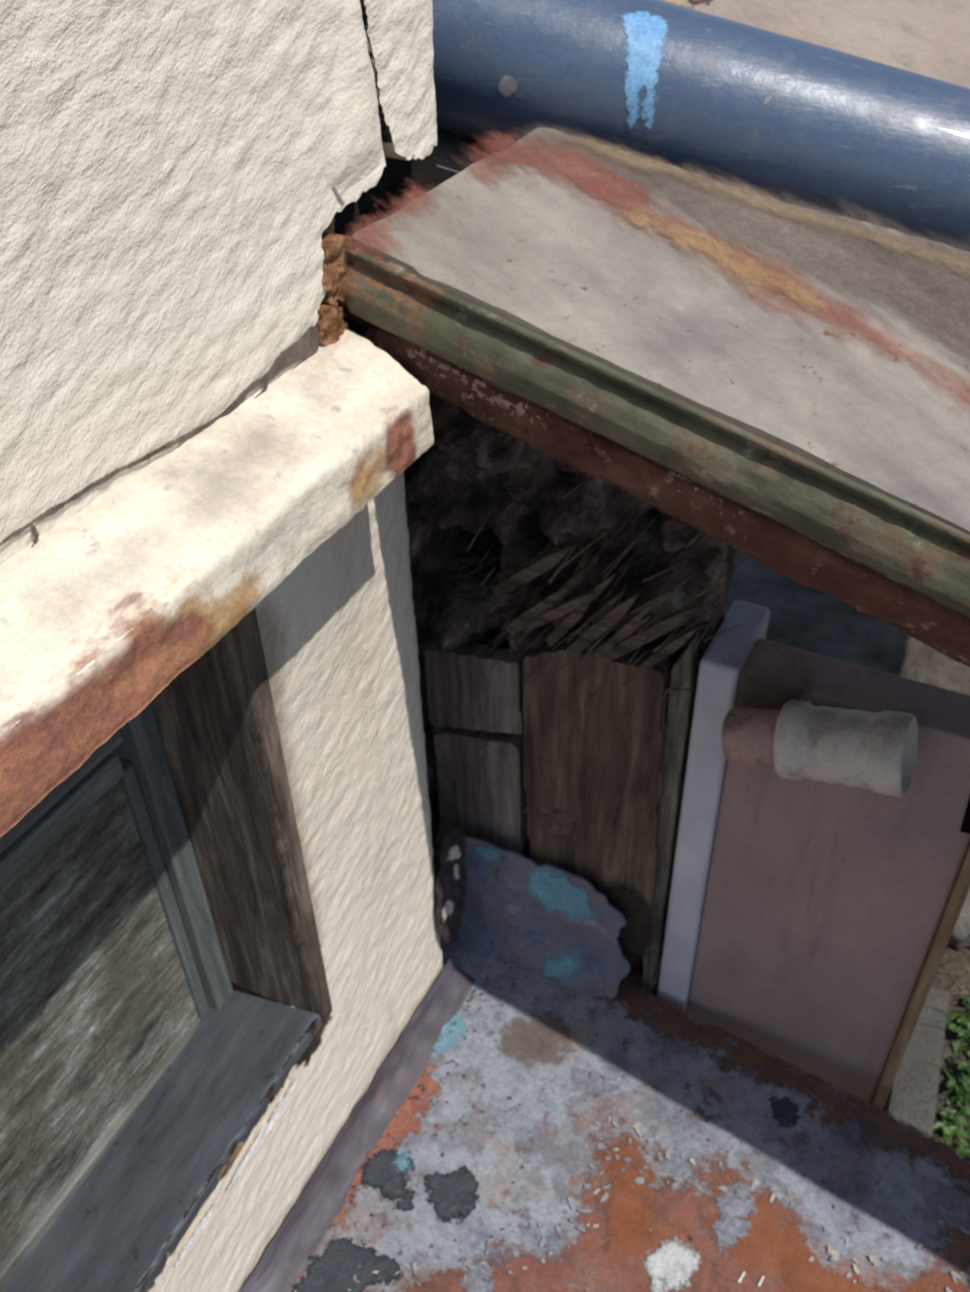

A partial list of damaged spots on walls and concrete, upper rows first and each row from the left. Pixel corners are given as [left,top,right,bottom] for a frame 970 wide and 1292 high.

crack [360,0,393,145]
crack [333,187,344,206]
corrosion [474,136,970,402]
corrosion [350,412,417,504]
corrosion [0,579,259,838]
corrosion [328,1063,441,1230]
corrosion [353,1116,970,1292]
corrosion [603,980,970,1196]